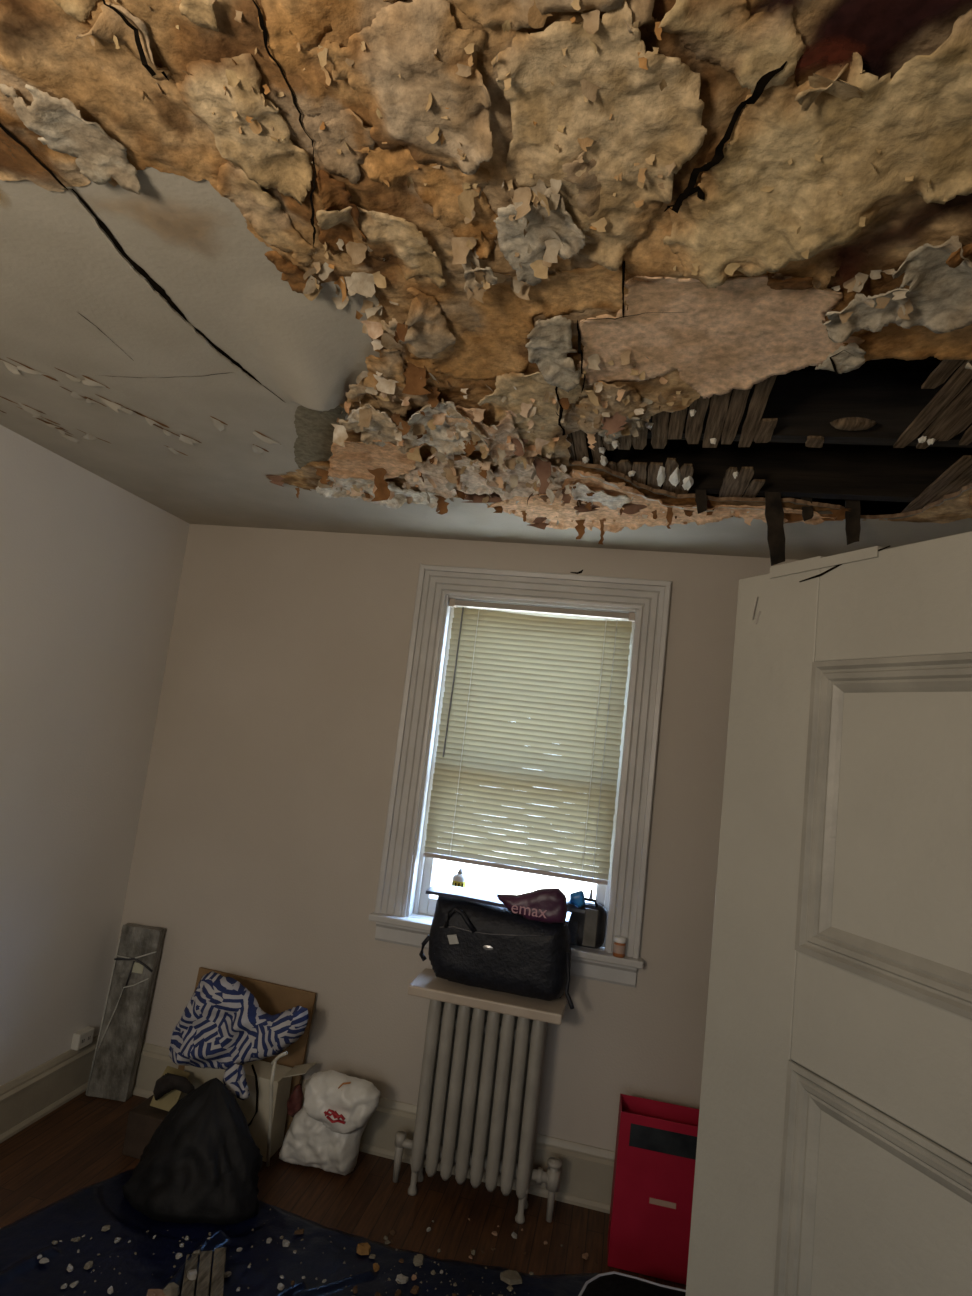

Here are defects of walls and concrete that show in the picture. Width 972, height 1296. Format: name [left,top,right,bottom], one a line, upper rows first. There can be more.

crack [102,0,169,81]
water stain [753,0,800,16]
water stain [794,0,972,80]
water stain [0,127,55,179]
crack [252,0,316,247]
crack [664,61,787,214]
crack [0,123,283,401]
peeling [0,0,972,545]
water stain [833,193,972,277]